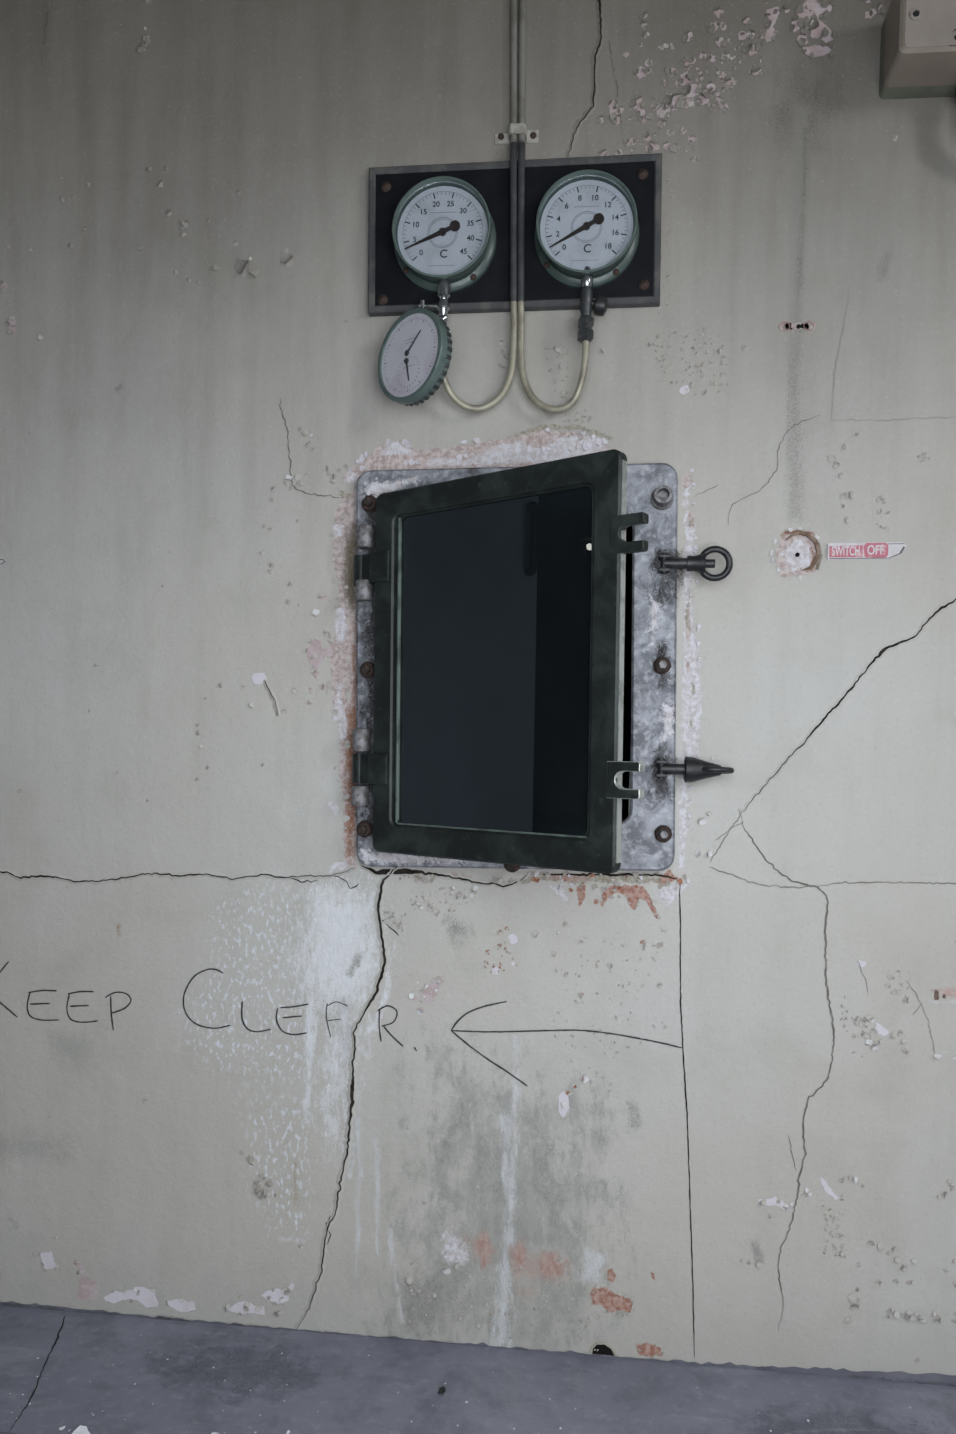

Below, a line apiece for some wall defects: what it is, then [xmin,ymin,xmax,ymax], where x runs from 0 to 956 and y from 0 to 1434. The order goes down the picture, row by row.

crack [565,0,625,157]
peeling [596,0,837,163]
flaking render [270,343,613,883]
crack [263,679,281,717]
flaking render [383,464,714,1062]
crack [710,596,956,1330]
crack [0,864,695,1358]
water stain [143,868,676,1412]
peeling [558,1066,612,1118]
water stain [1,1302,195,1322]
peeling [104,1286,196,1313]
peeling [224,1282,294,1317]